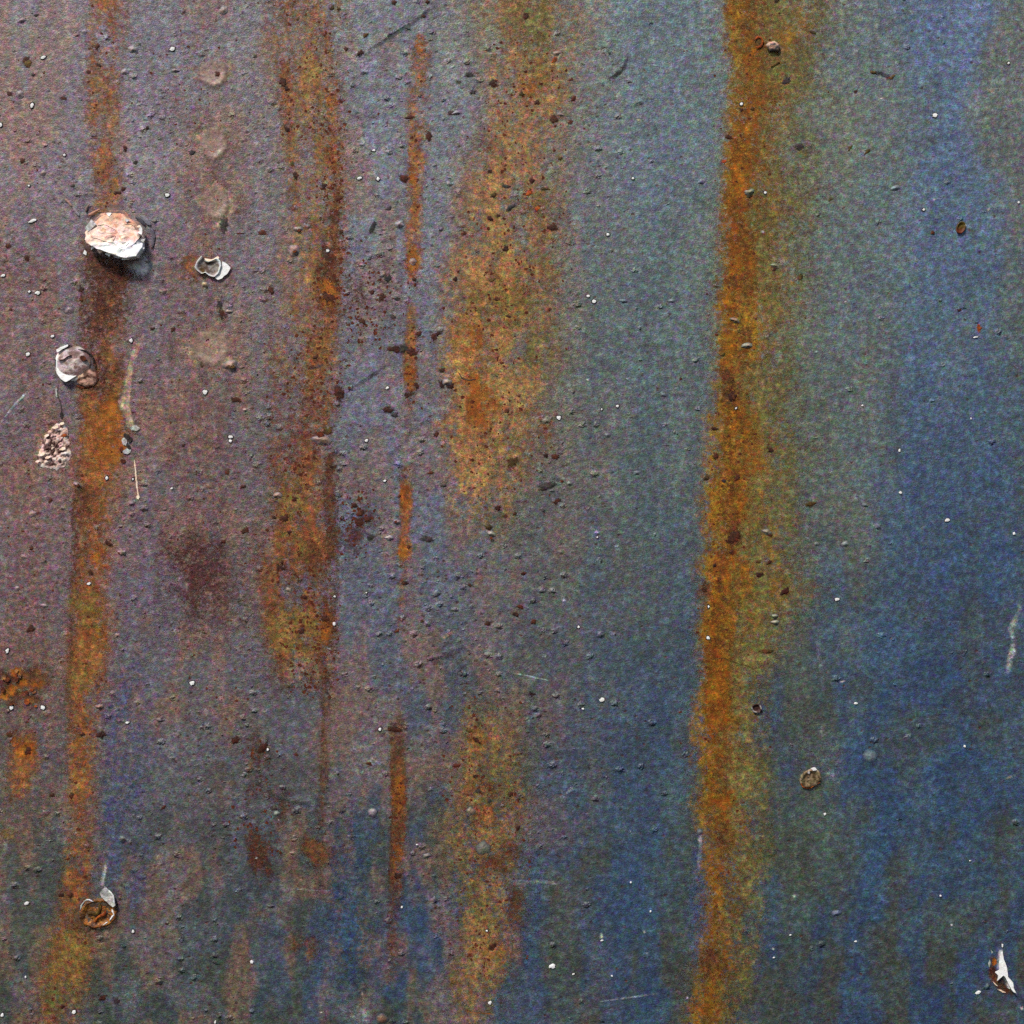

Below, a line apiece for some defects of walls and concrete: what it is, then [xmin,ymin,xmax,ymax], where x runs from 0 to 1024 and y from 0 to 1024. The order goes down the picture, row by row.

corrosion [85,0,124,219]
peeling [181,255,230,280]
peeling [34,422,72,471]
corrosion [160,0,593,825]
corrosion [678,0,829,1024]
corrosion [0,255,140,1024]
corrosion [387,719,408,961]
corrosion [436,696,531,1011]
spalling [988,944,1016,994]